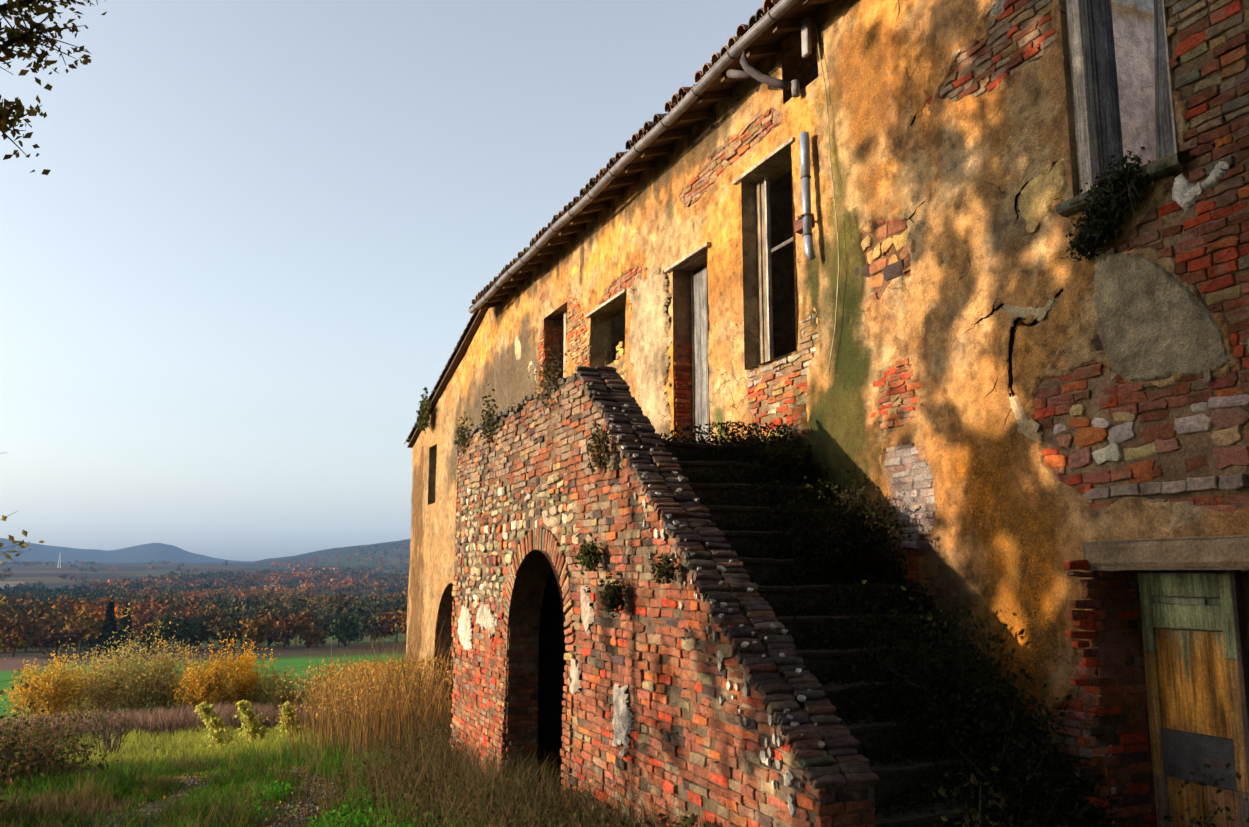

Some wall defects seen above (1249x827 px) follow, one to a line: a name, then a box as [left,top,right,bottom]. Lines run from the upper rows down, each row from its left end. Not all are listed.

spalling [927,0,1067,105]
spalling [680,100,784,207]
spalling [854,217,916,304]
spalling [1035,0,1249,512]
spalling [747,315,819,454]
spalling [870,358,925,431]
crack [951,289,1063,432]
spalling [884,443,948,641]